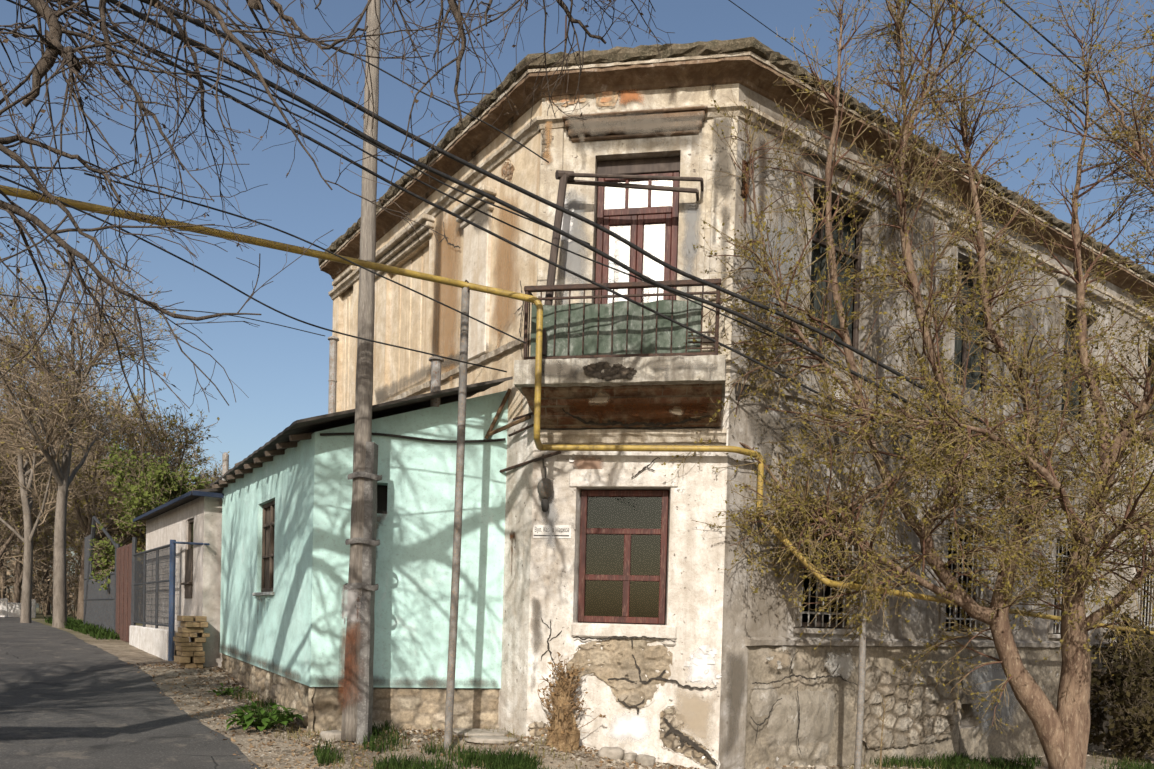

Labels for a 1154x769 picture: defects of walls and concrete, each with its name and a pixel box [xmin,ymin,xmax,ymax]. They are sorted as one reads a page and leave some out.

crack [562,408,711,427]
crack [631,457,660,478]
crack [541,618,718,766]
spalling [564,638,722,769]
crack [750,651,858,753]
spalling [824,647,962,750]